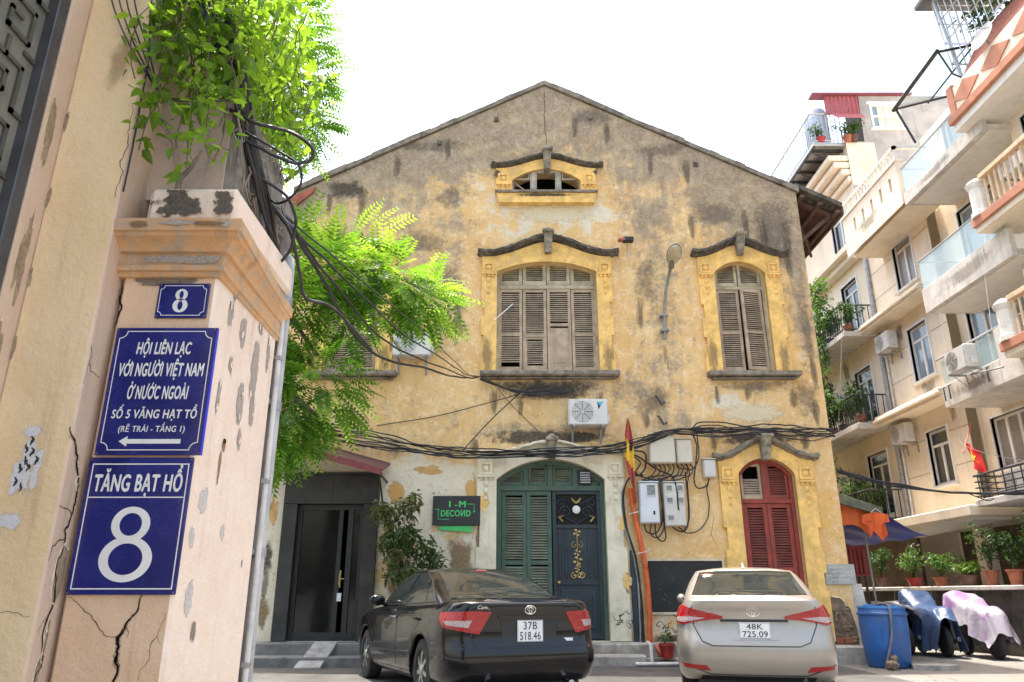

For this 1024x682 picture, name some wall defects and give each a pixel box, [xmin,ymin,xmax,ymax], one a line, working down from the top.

peeling [149,189,234,227]
damp [327,180,365,211]
peeling [216,295,271,451]
damp [498,381,590,413]
damp [492,428,605,444]
peeling [412,464,444,476]
peeling [269,495,279,526]
crack [0,427,166,682]